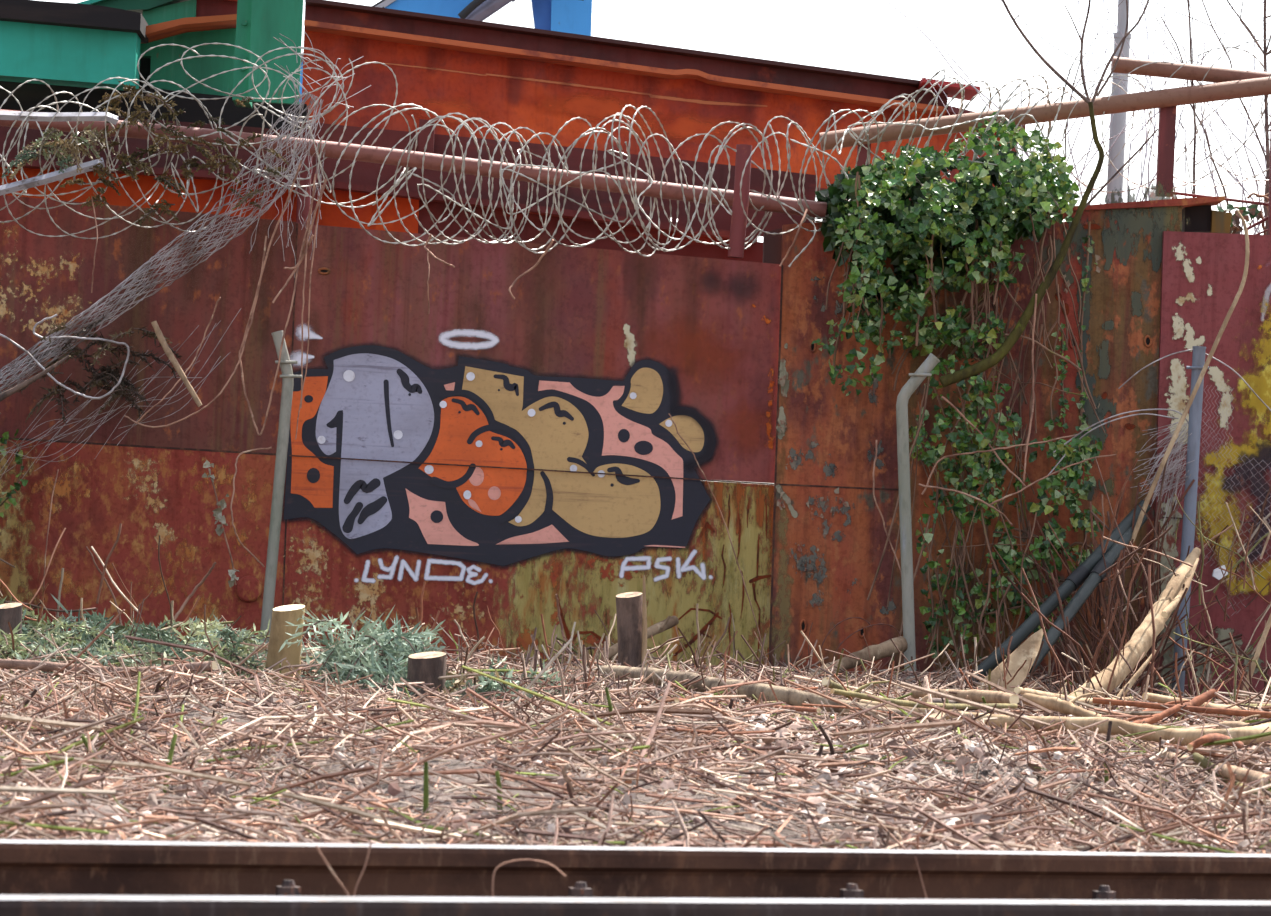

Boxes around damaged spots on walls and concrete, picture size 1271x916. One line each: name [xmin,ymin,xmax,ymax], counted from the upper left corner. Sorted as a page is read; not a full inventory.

rust [415,102,481,124]
rust [544,95,743,139]
rust [0,251,91,335]
peeling [1049,181,1212,463]
peeling [1208,366,1233,430]
rust [0,446,98,610]
rust [121,453,226,617]
rust [290,527,437,640]
rust [443,592,485,633]
rust [499,481,774,670]
peeling [776,343,855,610]